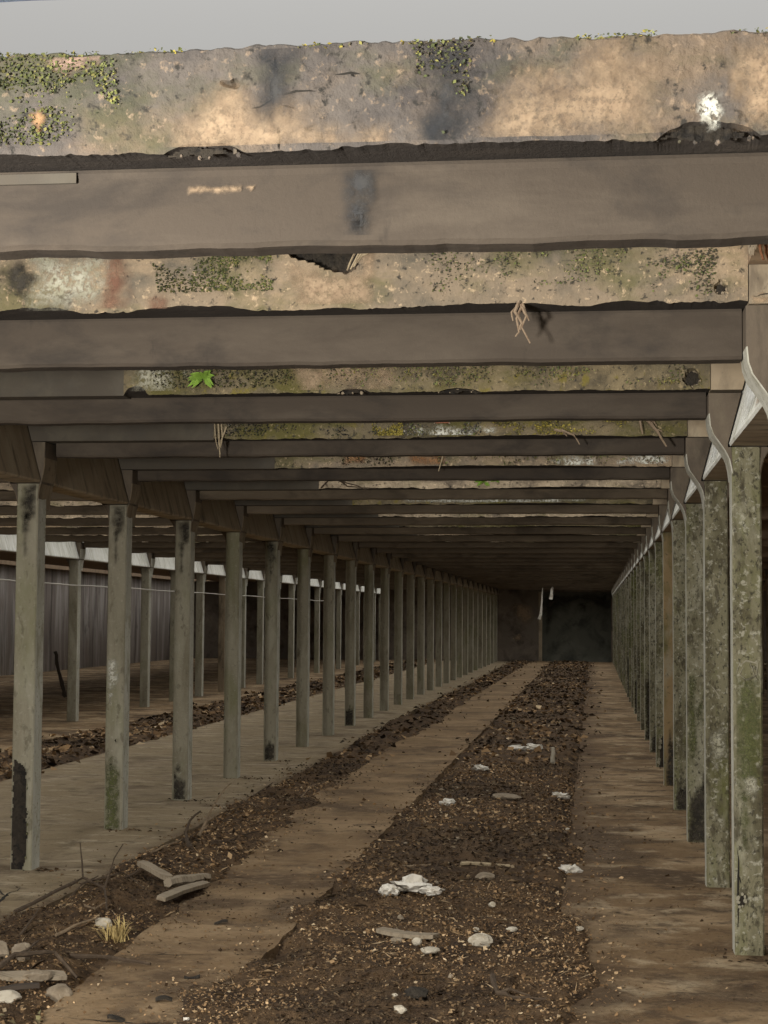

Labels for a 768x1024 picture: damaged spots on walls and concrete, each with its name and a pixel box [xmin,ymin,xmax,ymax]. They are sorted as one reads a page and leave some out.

peeling [735,50,768,119]
efflorescence [698,94,721,125]
spalling [656,124,754,146]
damp [8,264,35,293]
peeling [292,253,373,304]